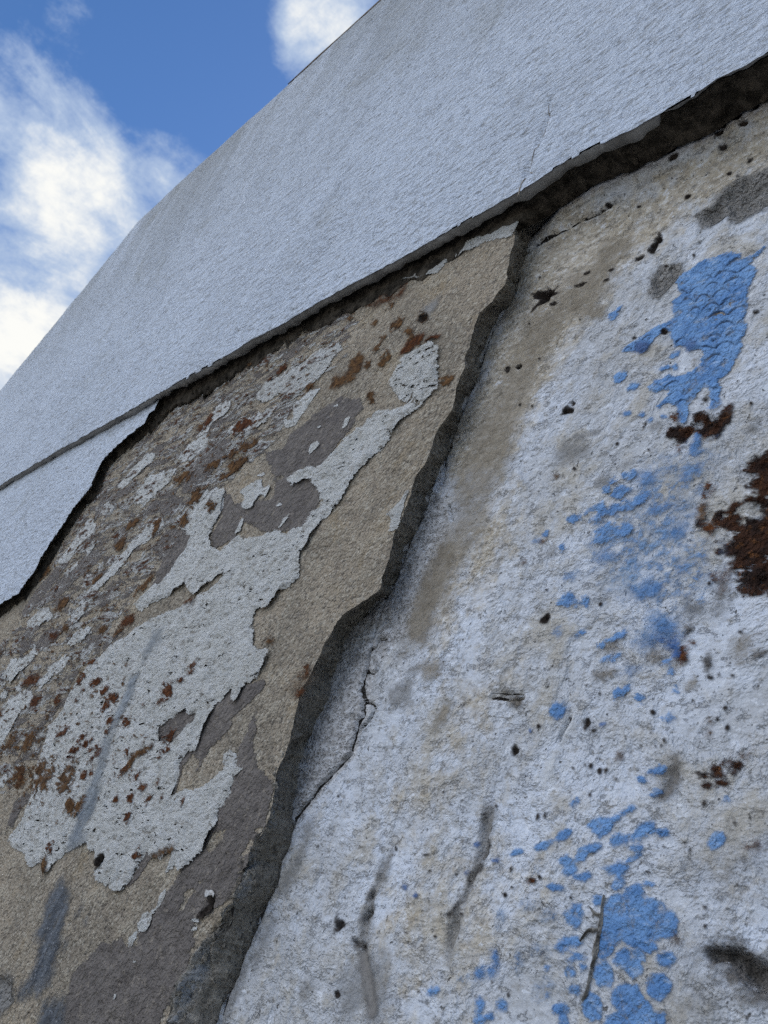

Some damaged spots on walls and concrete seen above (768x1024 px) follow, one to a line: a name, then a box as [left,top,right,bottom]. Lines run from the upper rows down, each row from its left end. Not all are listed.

crack [517,105,550,197]
crack [533,201,622,250]
peeling [241,439,274,465]
rust [665,397,734,452]
rust [695,450,768,597]
rust [0,286,442,832]
peeling [0,601,64,702]
crack [492,693,525,706]
crack [295,640,385,825]
rust [131,846,175,859]
crack [213,906,266,936]